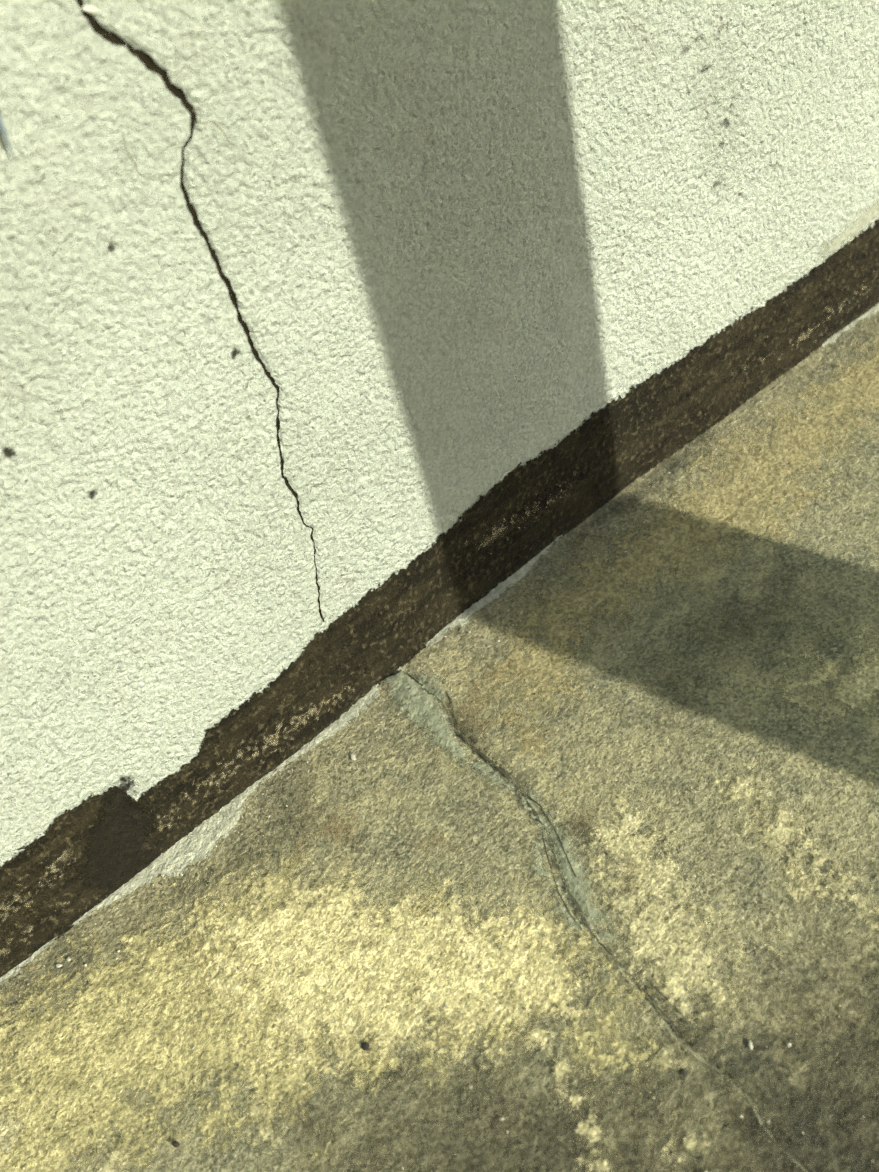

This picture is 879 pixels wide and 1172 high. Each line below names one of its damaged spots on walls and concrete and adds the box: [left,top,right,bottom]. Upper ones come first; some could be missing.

crack [75,0,324,622]
crack [382,667,815,1172]